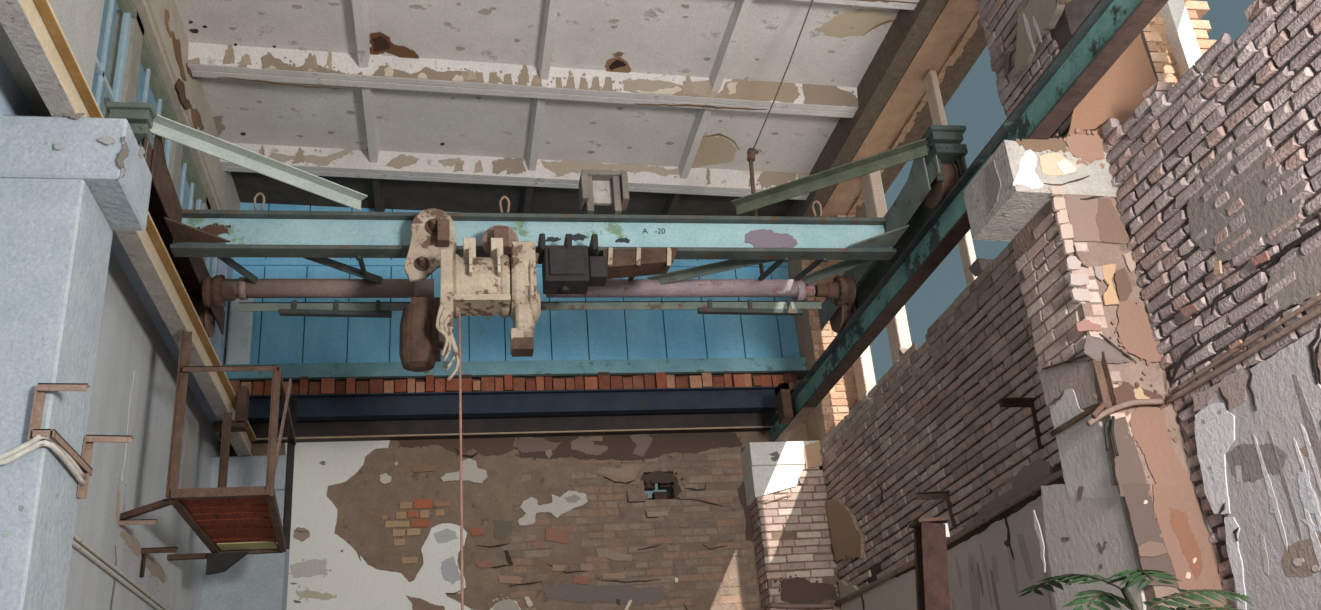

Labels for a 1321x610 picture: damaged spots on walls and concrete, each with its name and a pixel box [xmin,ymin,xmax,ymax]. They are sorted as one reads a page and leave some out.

spalling [164,9,204,131]
spalling [370,32,419,59]
spalling [605,51,631,73]
crack [1023,0,1057,51]
flaking render [1012,34,1158,306]
crack [1170,224,1321,388]
flaking render [285,440,488,610]
flaking render [518,490,588,544]
flaking render [516,436,608,459]
flaking render [947,360,1179,610]
flaking render [1176,328,1321,610]
flaking render [838,570,917,610]